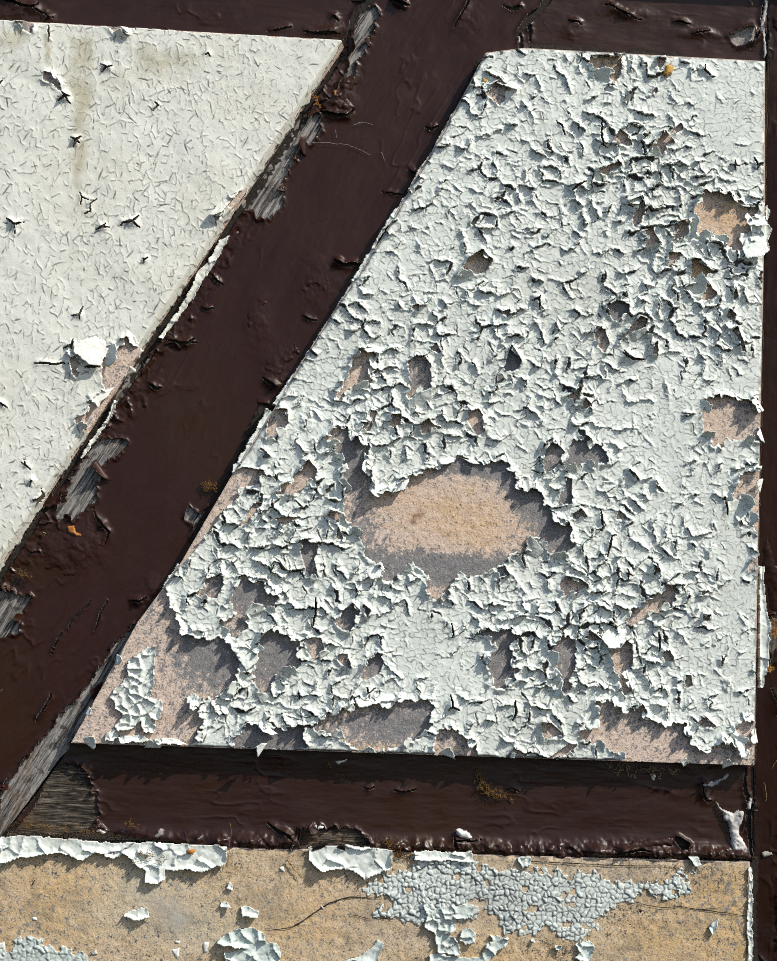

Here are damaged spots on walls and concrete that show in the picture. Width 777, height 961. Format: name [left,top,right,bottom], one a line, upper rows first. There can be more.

peeling [159,236,230,339]
crack [0,0,409,591]
peeling [626,187,772,303]
peeling [700,393,765,448]
peeling [326,405,612,604]
crack [51,600,108,655]
peeling [0,322,389,884]
crack [311,597,319,626]
peeling [233,694,479,759]
peeling [541,582,758,769]
crack [265,896,395,930]
peeling [296,822,701,961]